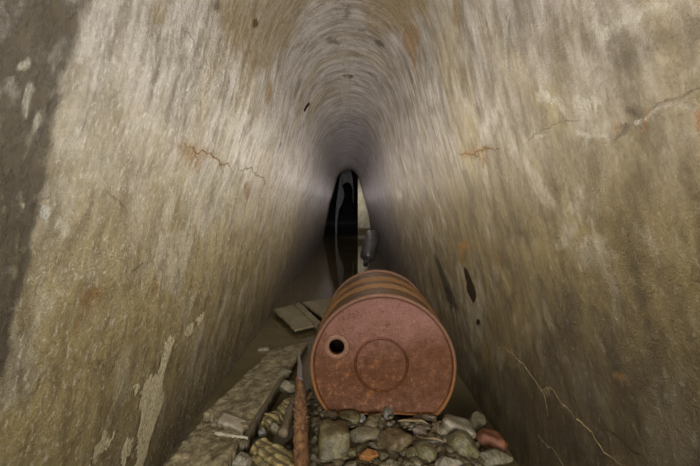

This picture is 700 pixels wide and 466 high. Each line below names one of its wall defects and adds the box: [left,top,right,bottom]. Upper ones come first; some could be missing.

crack [183,143,265,185]
leakage [0,0,84,374]
spalling [464,268,476,303]
peeling [183,313,204,338]
peeling [120,334,175,466]
crack [496,347,641,466]
peeling [89,427,115,466]